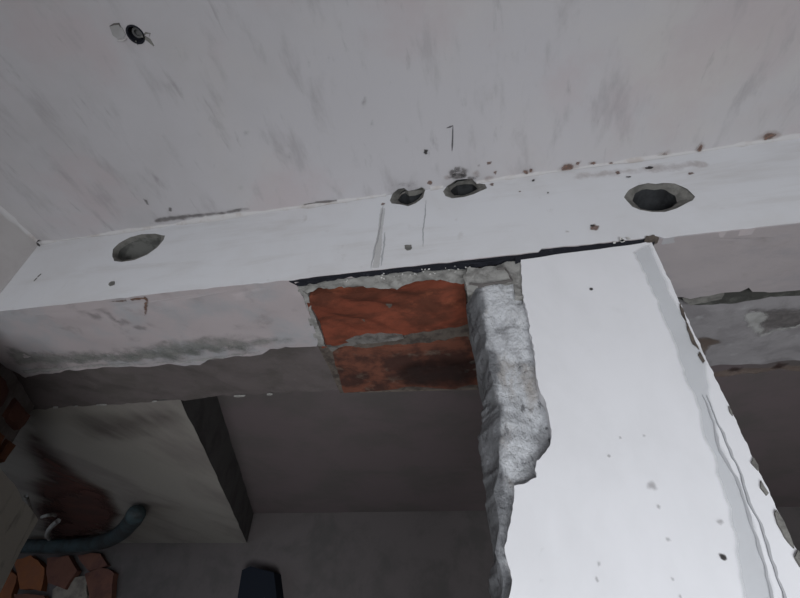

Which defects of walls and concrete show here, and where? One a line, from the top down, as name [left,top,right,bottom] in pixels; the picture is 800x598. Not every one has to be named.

leakage [11,338,268,373]
spalling [680,304,705,363]
flaking render [746,310,800,334]
flaking render [298,261,550,598]